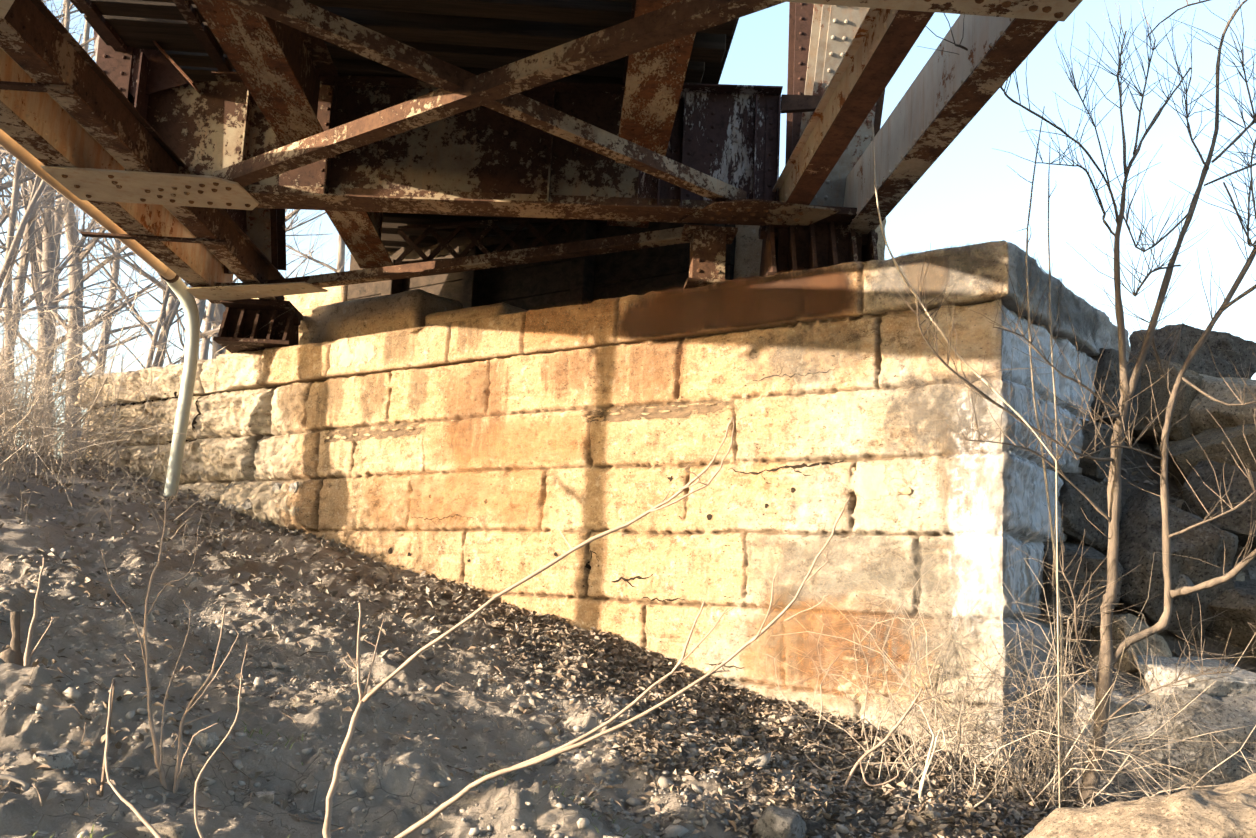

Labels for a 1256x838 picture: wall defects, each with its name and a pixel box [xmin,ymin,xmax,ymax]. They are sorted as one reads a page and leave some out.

rust [621,268,850,337]
crack [728,461,847,484]